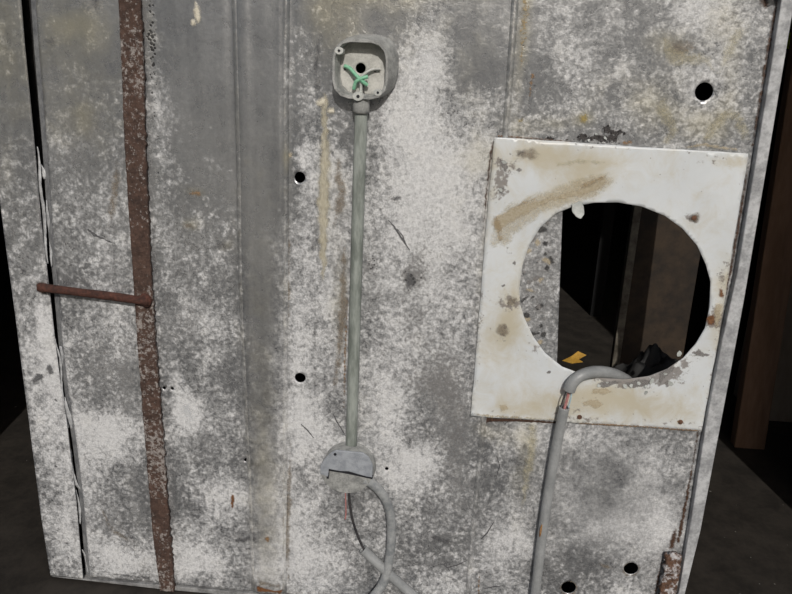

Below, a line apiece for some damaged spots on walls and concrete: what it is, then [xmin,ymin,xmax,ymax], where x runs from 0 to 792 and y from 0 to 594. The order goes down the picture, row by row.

peeling [566,124,626,142]
corrosion [118,0,176,592]
peeling [597,367,674,395]